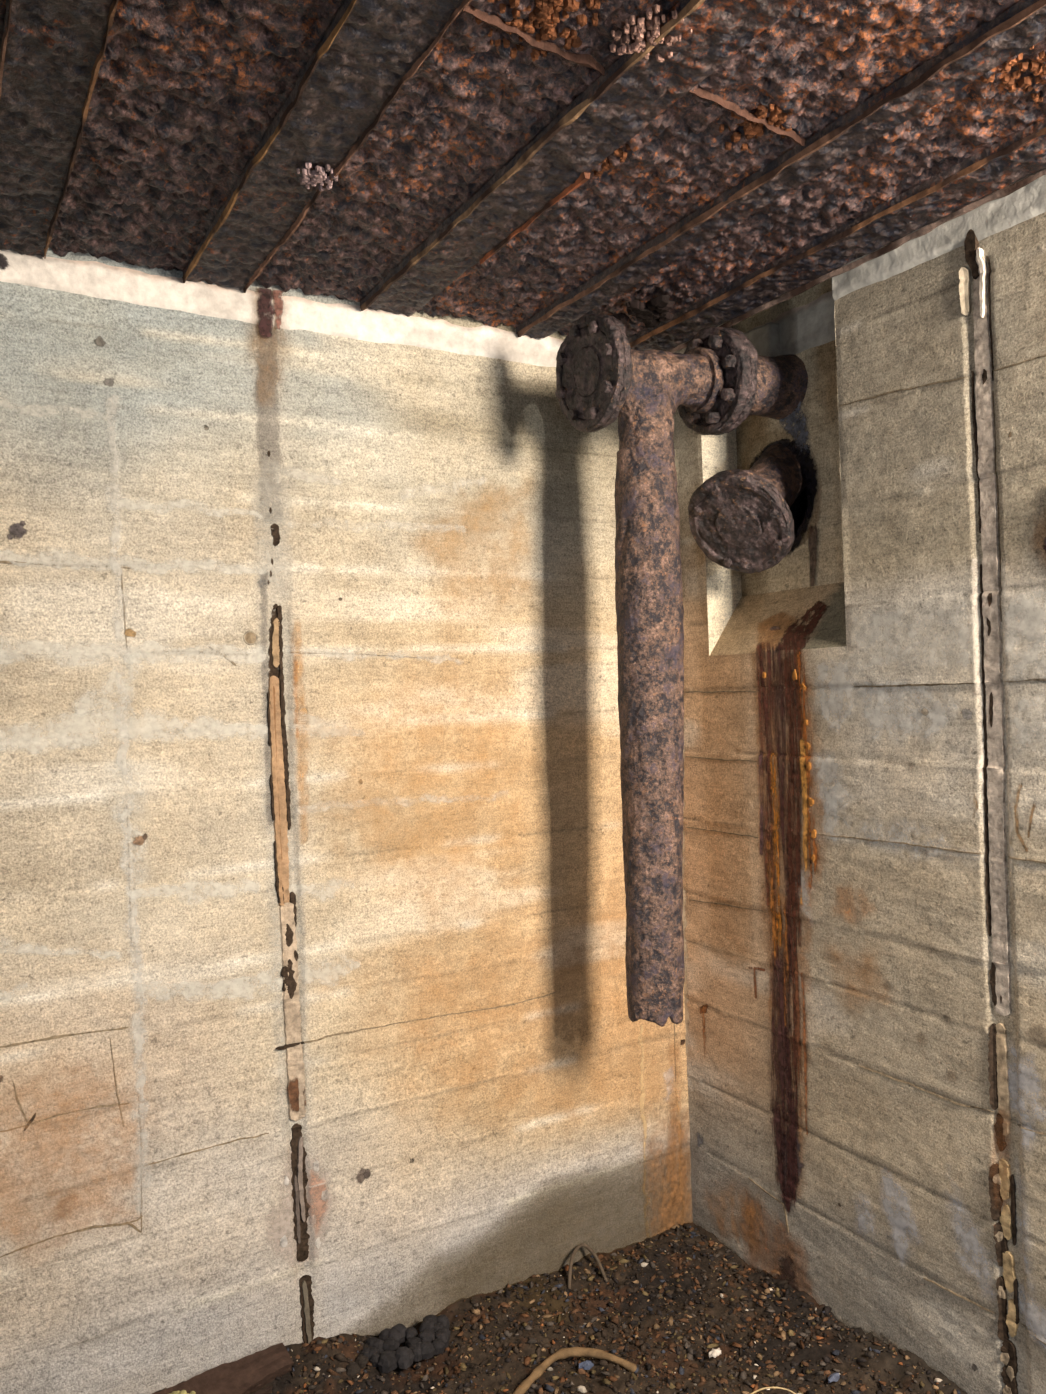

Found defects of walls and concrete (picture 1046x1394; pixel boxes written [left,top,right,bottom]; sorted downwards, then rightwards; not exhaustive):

corrosion [475,0,601,61]
corrosion [980,38,1046,103]
corrosion [719,104,793,151]
corrosion [591,143,631,177]
corrosion [257,287,283,338]
corrosion [610,295,675,328]
leakage [285,710,363,735]
corrosion [748,601,828,1213]
corrosion [700,1004,708,1051]